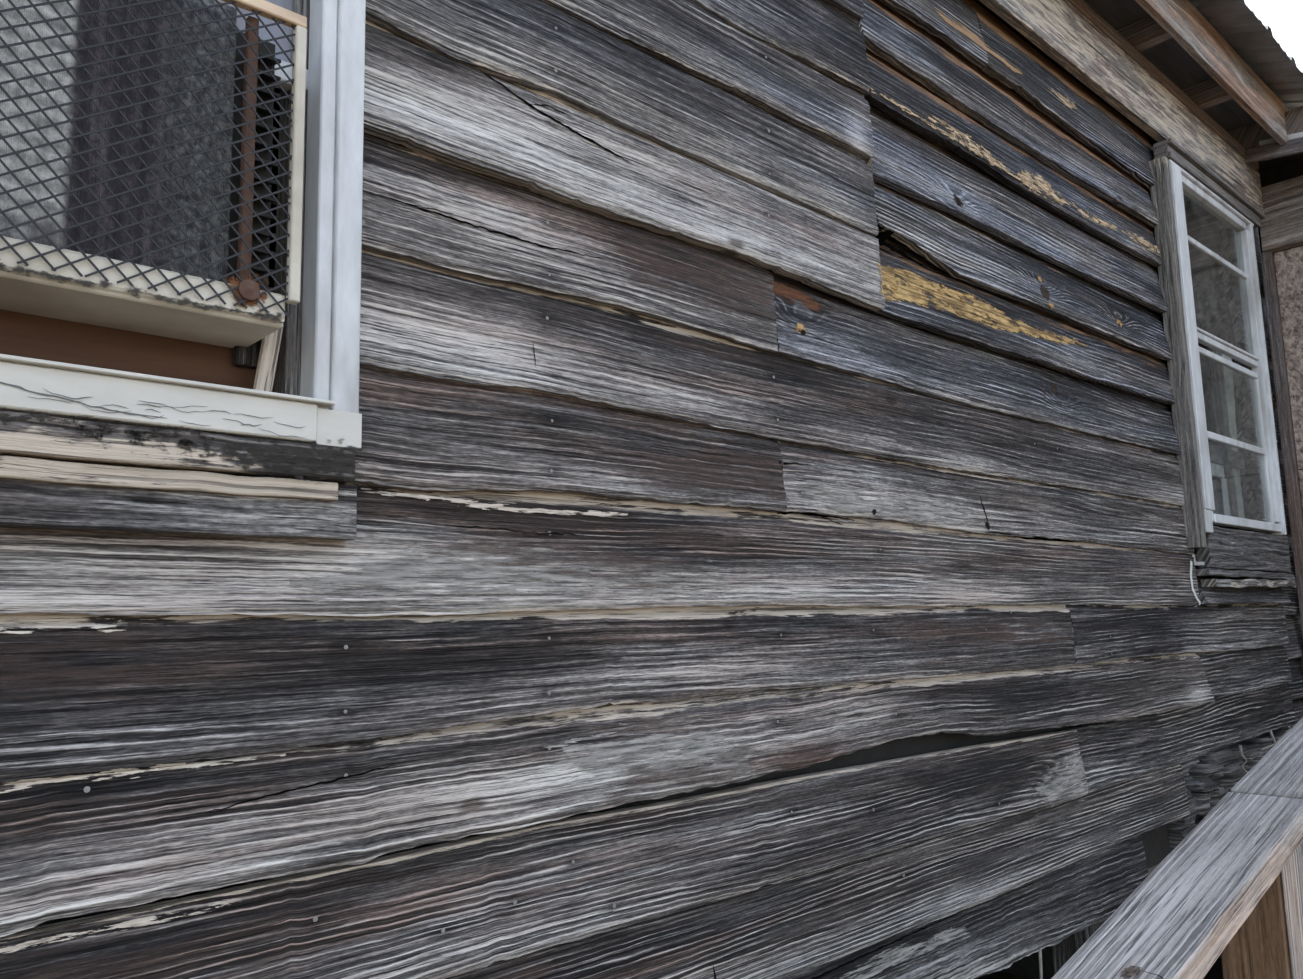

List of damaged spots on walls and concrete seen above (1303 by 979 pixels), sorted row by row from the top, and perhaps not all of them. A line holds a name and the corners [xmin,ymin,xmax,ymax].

crack [476,68,629,162]
peeling [870,87,1029,186]
rust [229,275,267,313]
crack [207,765,394,813]